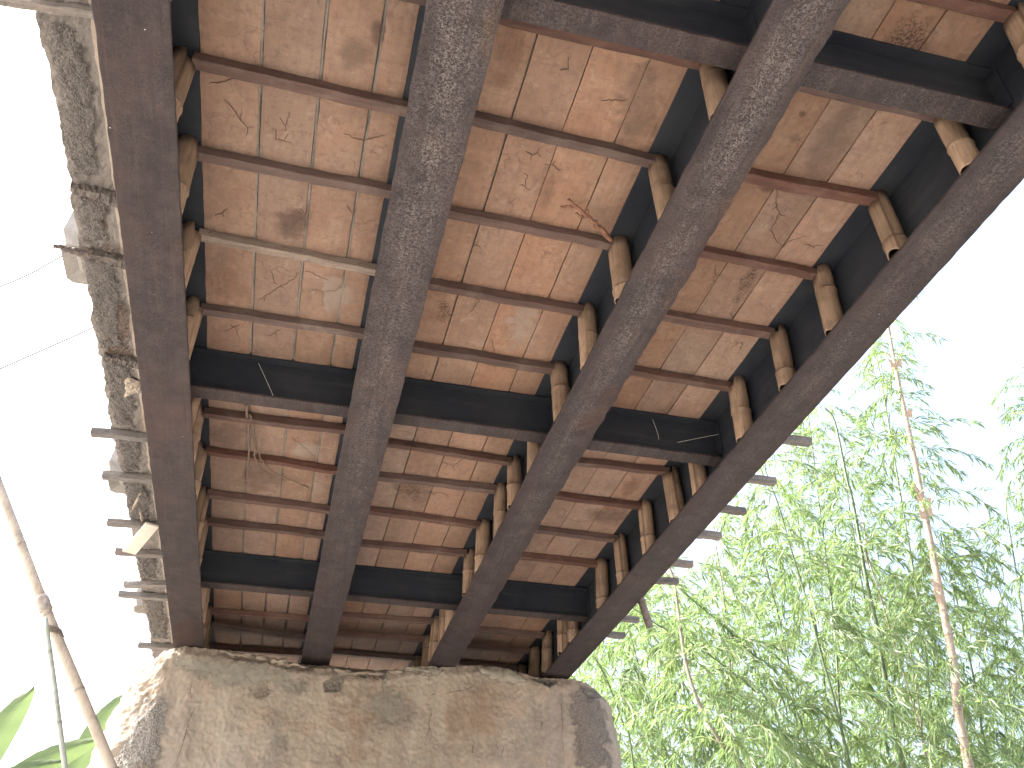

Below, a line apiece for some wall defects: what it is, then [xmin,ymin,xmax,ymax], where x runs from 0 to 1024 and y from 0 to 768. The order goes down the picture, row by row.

crack [211,78,292,144]
crack [519,148,558,190]
crack [770,190,821,248]
crack [261,270,341,302]